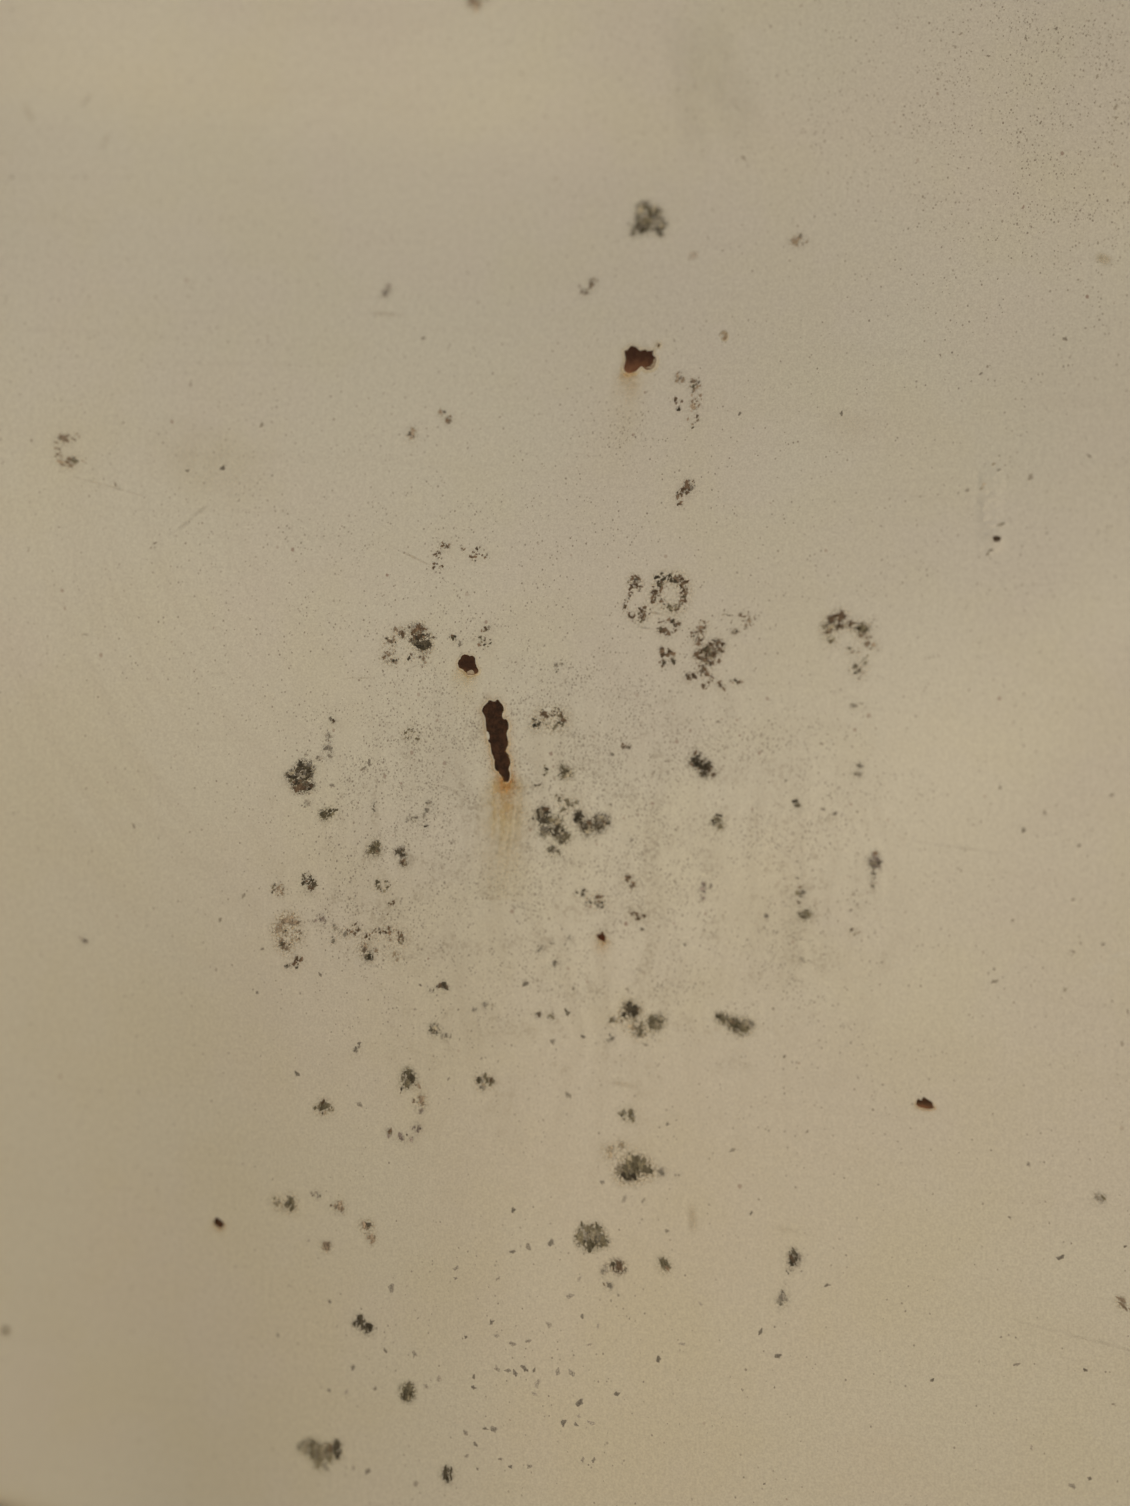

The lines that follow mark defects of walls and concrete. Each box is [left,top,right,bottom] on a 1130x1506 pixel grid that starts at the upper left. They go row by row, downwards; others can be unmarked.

rust [479,696,514,831]